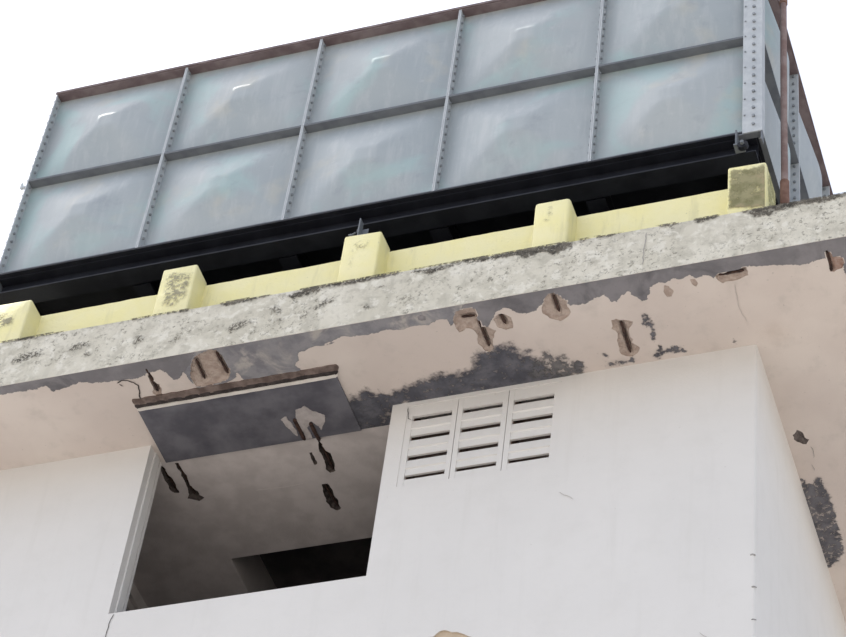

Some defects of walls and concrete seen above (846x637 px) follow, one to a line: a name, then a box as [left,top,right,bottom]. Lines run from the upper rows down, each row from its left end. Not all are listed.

peeling [0,237,846,395]
rust [132,364,339,405]
damp [349,345,584,429]
peeling [281,406,335,473]
spalling [793,430,809,444]
spalling [161,463,204,501]
spalling [322,484,341,510]
damp [800,478,844,568]